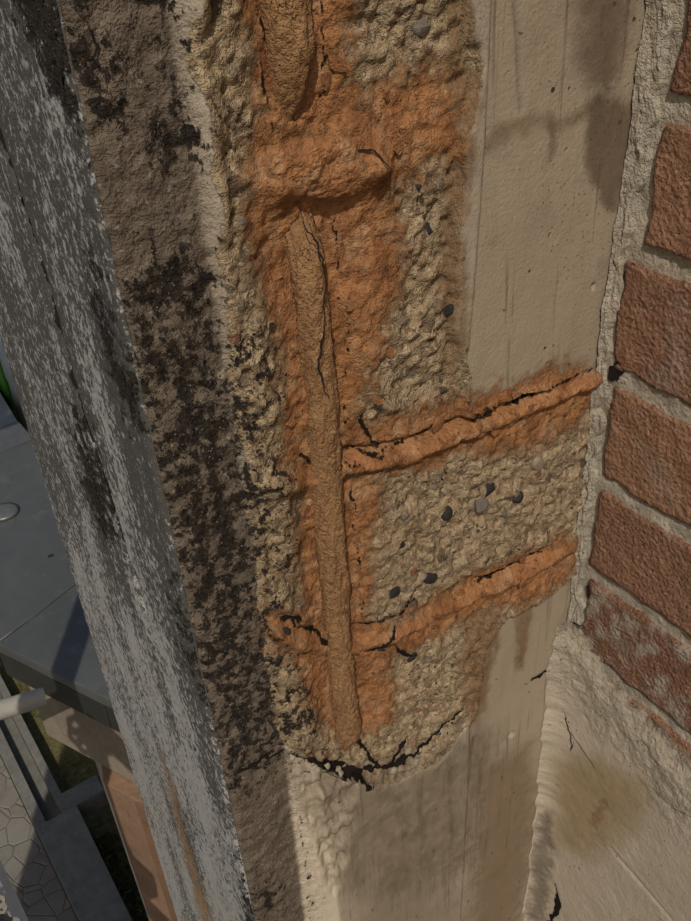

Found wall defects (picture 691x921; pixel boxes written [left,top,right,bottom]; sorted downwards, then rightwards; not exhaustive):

damp [3,0,221,184]
crack [318,1,331,113]
damp [589,104,631,204]
damp [56,354,132,569]
damp [74,218,328,812]
spalling [186,0,485,785]
corrosion [239,0,603,735]
crack [301,214,593,657]
spalling [347,405,592,634]
crack [280,615,332,651]
crack [237,708,464,792]
crack [548,884,562,921]